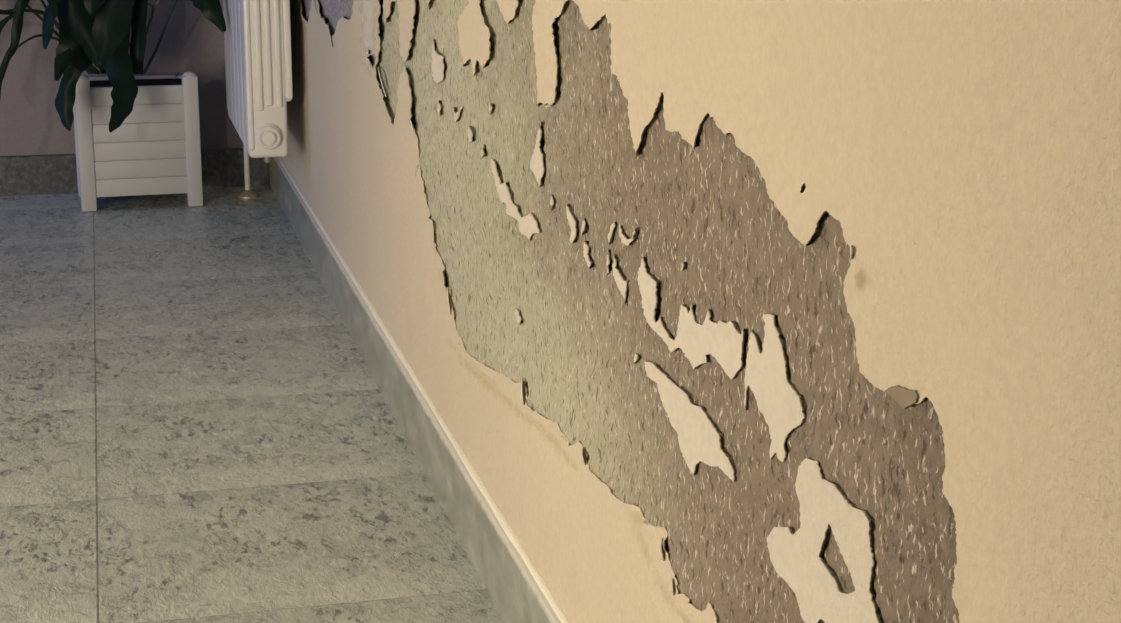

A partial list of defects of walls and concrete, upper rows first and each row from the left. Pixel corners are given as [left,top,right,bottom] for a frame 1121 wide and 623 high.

peeling [301,0,354,47]
peeling [368,0,959,623]